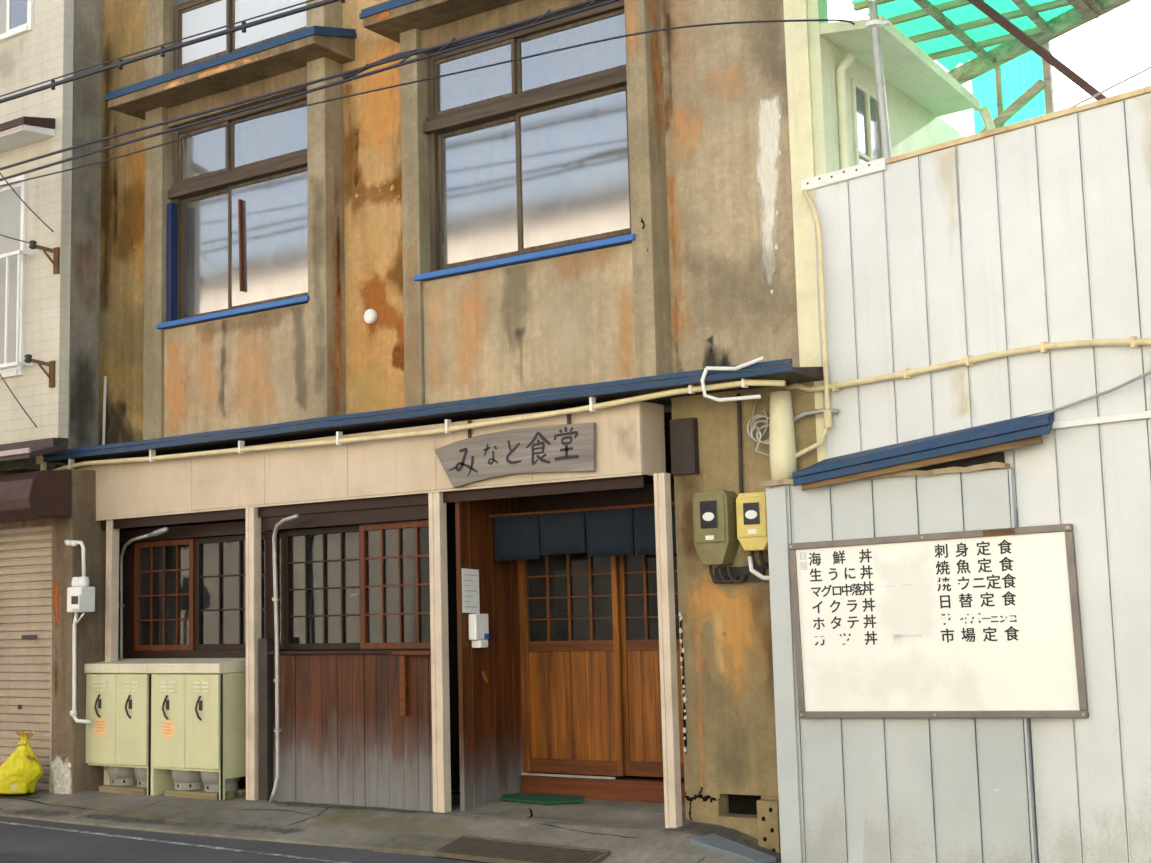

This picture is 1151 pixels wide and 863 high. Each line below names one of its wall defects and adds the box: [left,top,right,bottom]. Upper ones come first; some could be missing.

rust [650,0,672,127]
rust [101,52,117,295]
rust [362,276,404,370]
leakage [703,337,730,375]